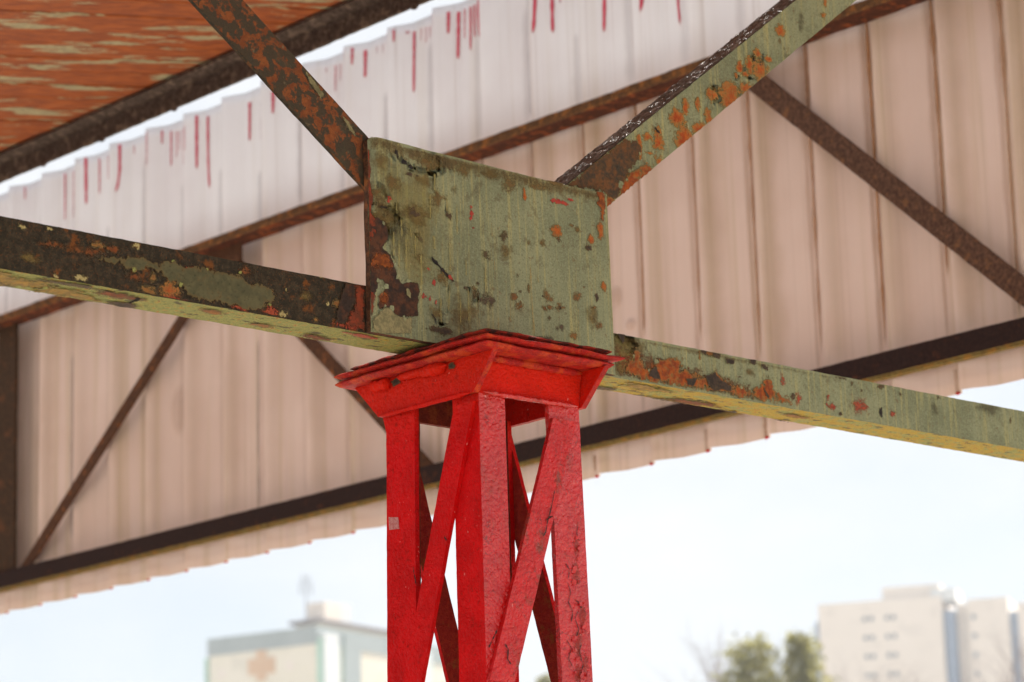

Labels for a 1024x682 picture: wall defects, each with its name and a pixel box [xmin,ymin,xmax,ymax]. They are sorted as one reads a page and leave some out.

corrosion [38,240,119,256]
corrosion [0,271,188,309]
peeling [96,243,287,317]
peeling [373,307,414,334]
corrosion [302,48,772,343]
corrosion [597,340,809,423]
corrosion [809,138,821,339]
corrosion [865,23,876,160]
corrosion [875,190,885,334]
corrosion [929,0,945,214]
corrosion [998,0,1017,270]